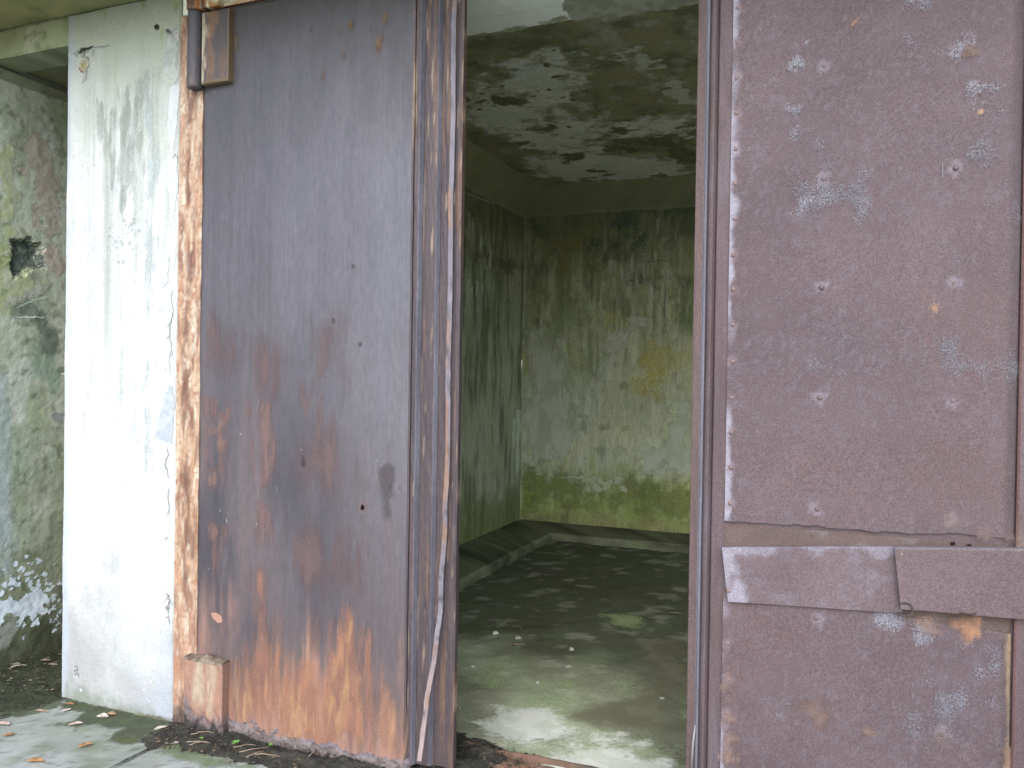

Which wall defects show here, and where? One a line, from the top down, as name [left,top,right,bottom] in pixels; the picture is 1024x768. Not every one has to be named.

leakage [466,64,594,111]
peeling [0,129,65,308]
leakage [96,76,159,328]
leakage [512,124,616,176]
leakage [583,210,681,330]
leakage [602,123,697,178]
peeling [0,613,20,650]
corrosion [231,571,287,722]
corrosion [317,609,406,754]
corrosion [954,616,980,643]